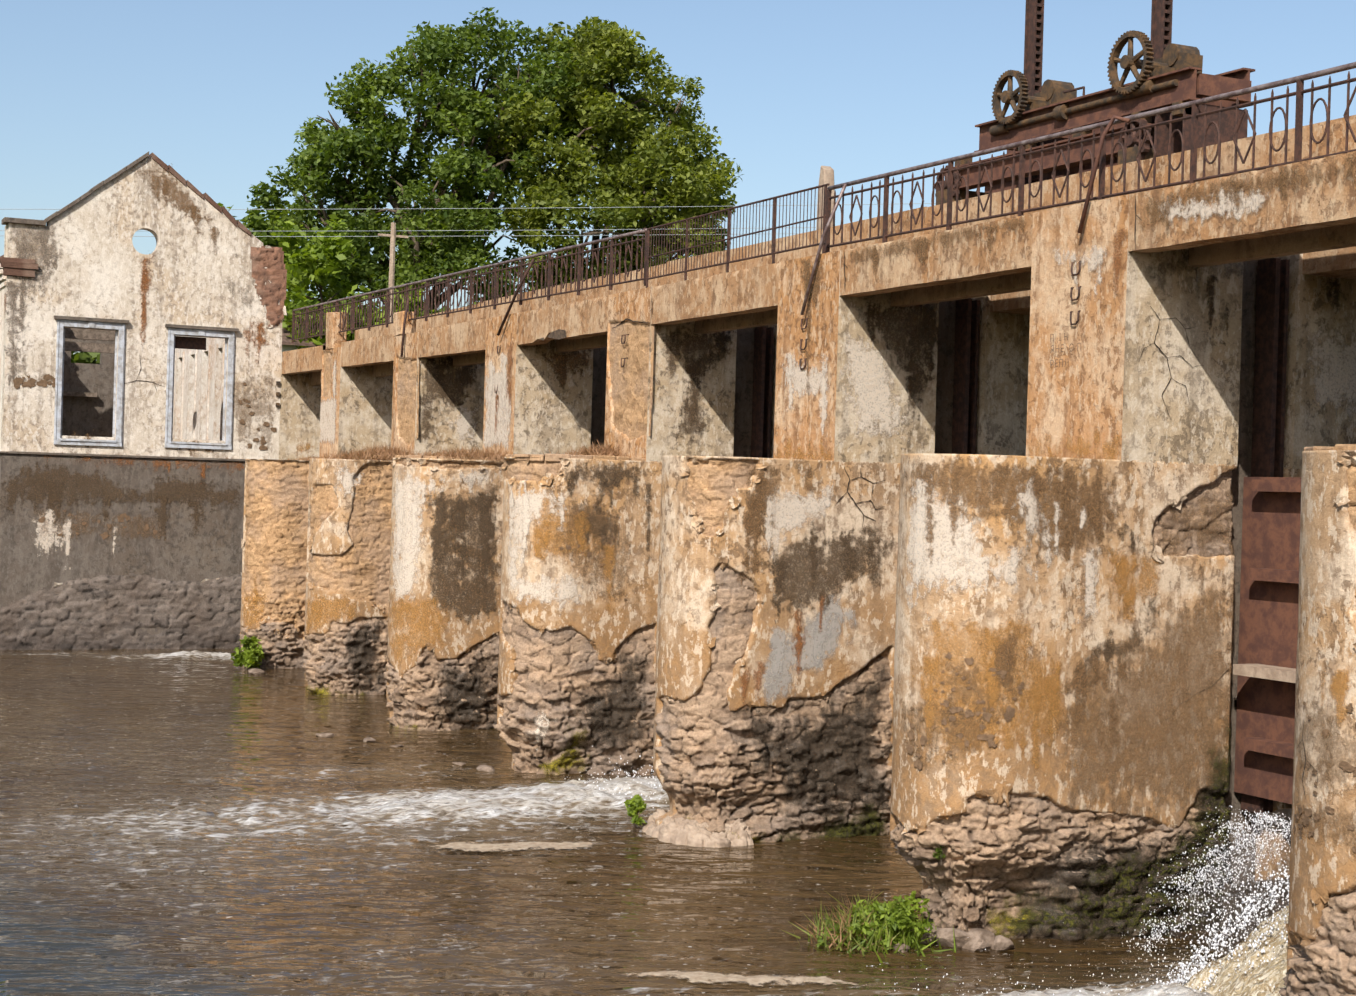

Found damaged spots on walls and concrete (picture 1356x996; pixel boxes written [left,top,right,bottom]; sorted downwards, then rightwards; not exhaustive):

rust [140,255,154,343]
spalling [250,245,287,329]
leakage [0,461,240,569]
spalling [1333,451,1356,531]
leakage [307,462,651,694]
spalling [0,352,1234,940]
leakage [737,453,1235,941]
peeling [1294,762,1335,838]
peeling [1339,761,1356,776]
spalling [1279,887,1356,996]